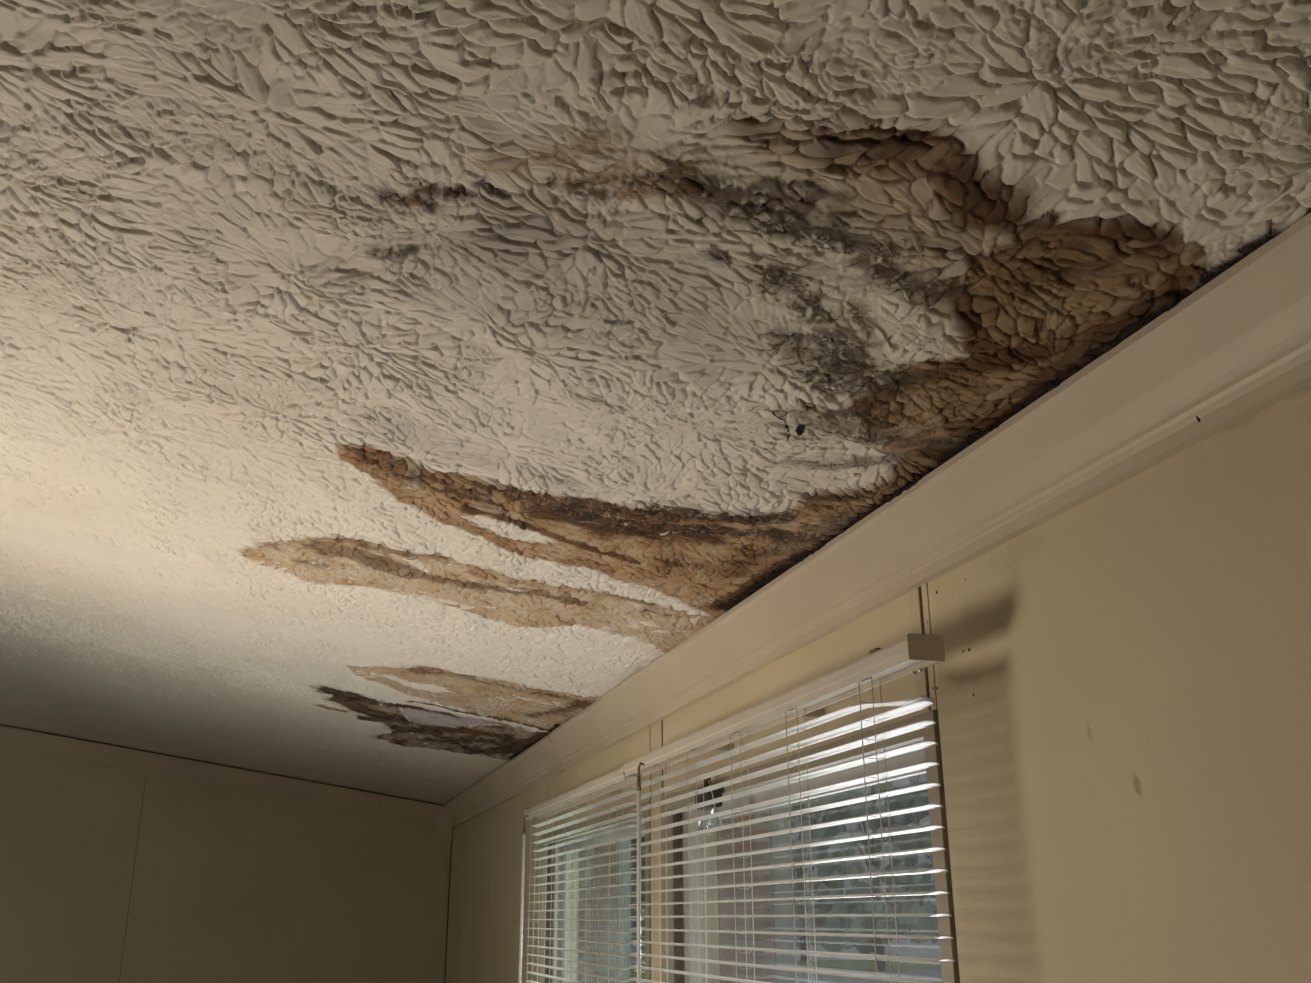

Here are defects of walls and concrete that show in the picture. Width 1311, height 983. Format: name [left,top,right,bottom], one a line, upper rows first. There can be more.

water stain [243,126,1280,653]
peeling [789,313,900,438]
peeling [582,505,712,535]